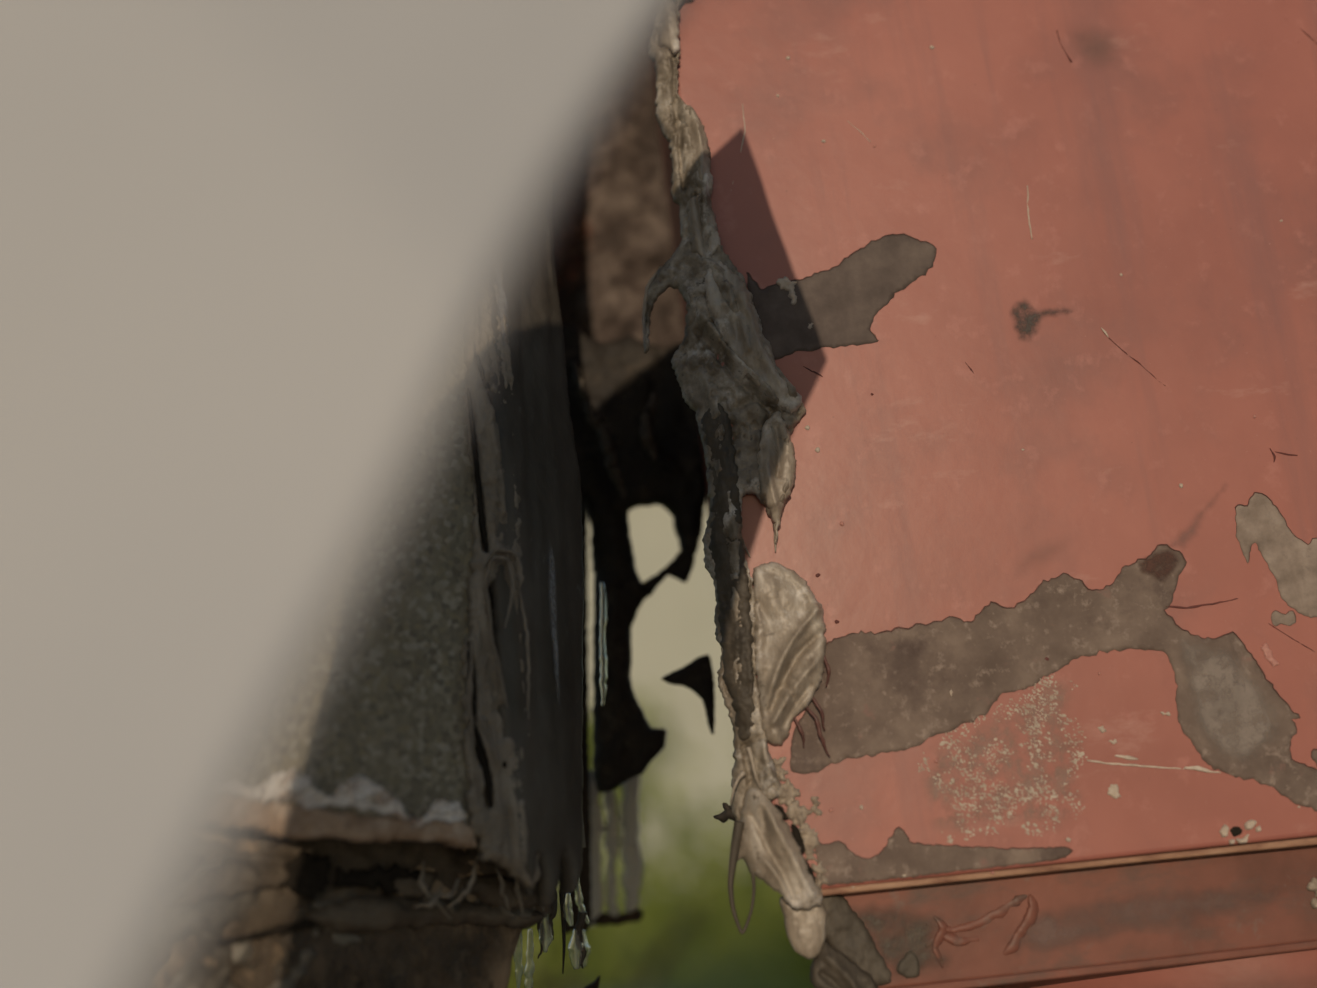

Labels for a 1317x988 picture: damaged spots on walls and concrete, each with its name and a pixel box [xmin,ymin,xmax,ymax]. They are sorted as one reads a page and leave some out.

peeling [746,233,937,360]
peeling [1235,492,1317,626]
peeling [790,544,1317,811]
spalling [248,800,478,848]
efflorescence [262,770,466,827]
peeling [815,827,1073,886]
hole [1219,819,1261,845]